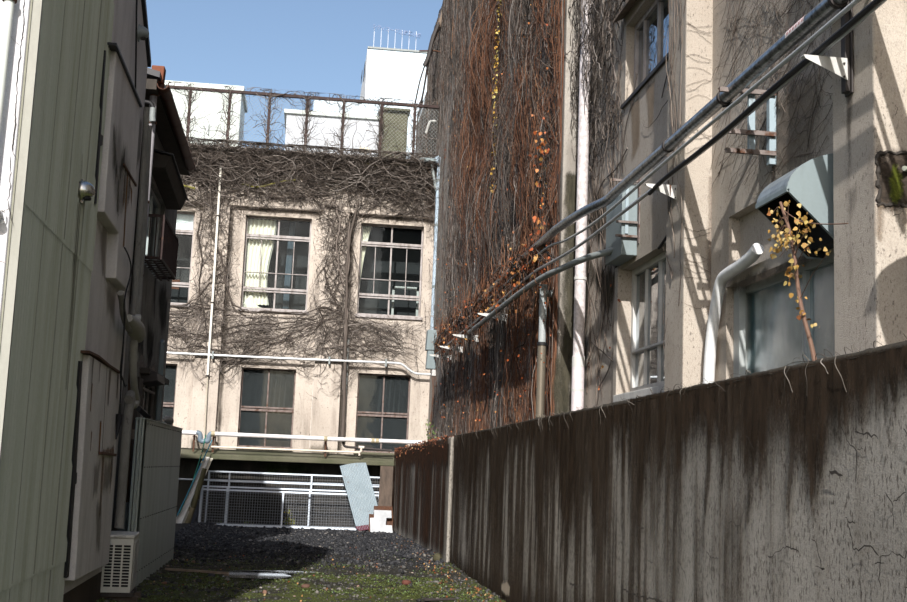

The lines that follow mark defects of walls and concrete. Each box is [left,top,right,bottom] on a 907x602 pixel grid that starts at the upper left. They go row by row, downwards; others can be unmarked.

crack [0,0,25,221]
damp [449,173,907,602]
crack [829,427,878,483]
crack [885,492,906,528]
crack [845,517,907,602]